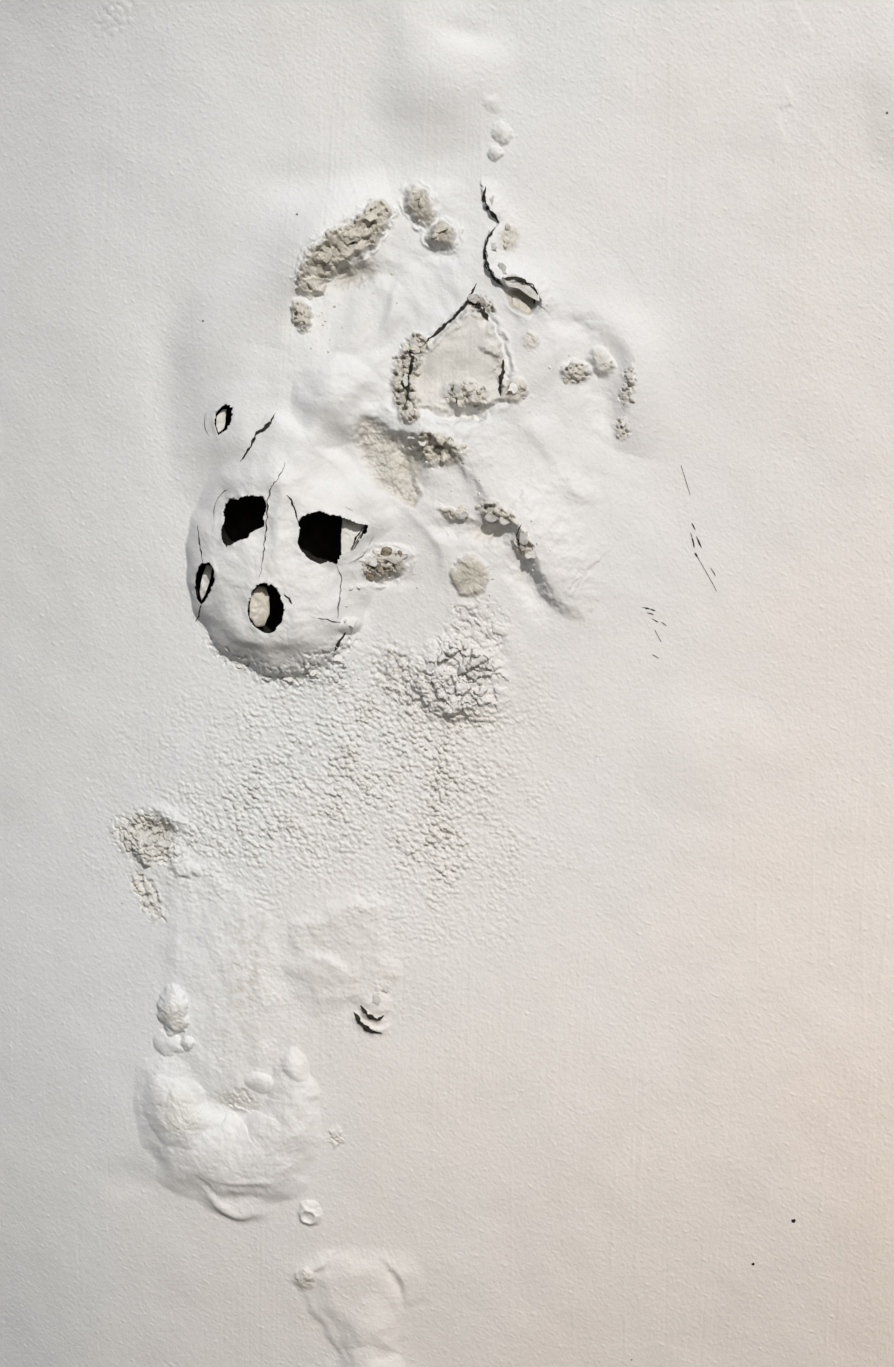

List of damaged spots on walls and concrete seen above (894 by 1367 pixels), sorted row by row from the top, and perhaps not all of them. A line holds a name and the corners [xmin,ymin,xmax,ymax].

spalling [260,178,464,362]
peeling [346,90,661,510]